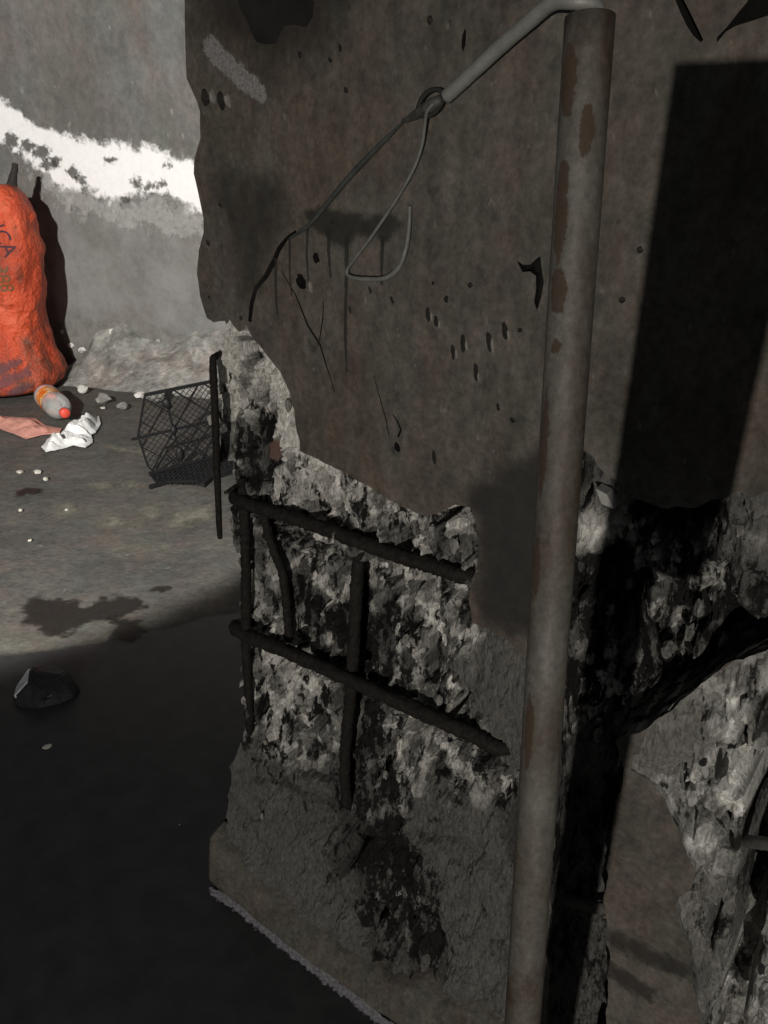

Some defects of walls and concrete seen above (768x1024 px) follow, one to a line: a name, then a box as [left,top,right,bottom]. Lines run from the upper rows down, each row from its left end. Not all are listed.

rust [561,43,595,157]
crack [248,230,335,392]
rust [551,160,569,313]
spalling [207,322,526,1021]
spalling [546,451,768,1024]